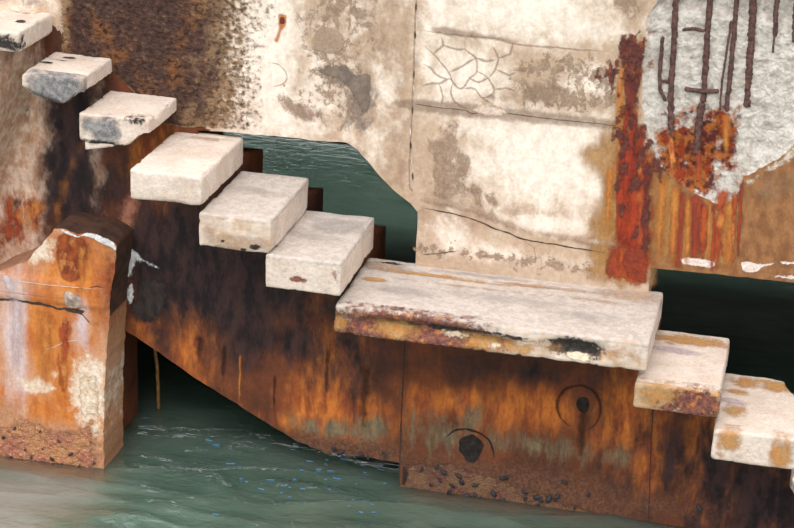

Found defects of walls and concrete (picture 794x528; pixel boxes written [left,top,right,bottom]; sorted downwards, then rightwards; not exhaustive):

rust [275,14,286,42]
crack [410,4,640,179]
spalling [641,0,794,204]
rust [497,31,743,304]
rust [0,193,43,248]
crack [426,208,604,253]
rust [57,234,87,288]
crack [0,278,103,349]
rust [376,319,418,340]
rust [465,333,532,354]
rust [643,377,788,418]
rust [770,440,790,467]